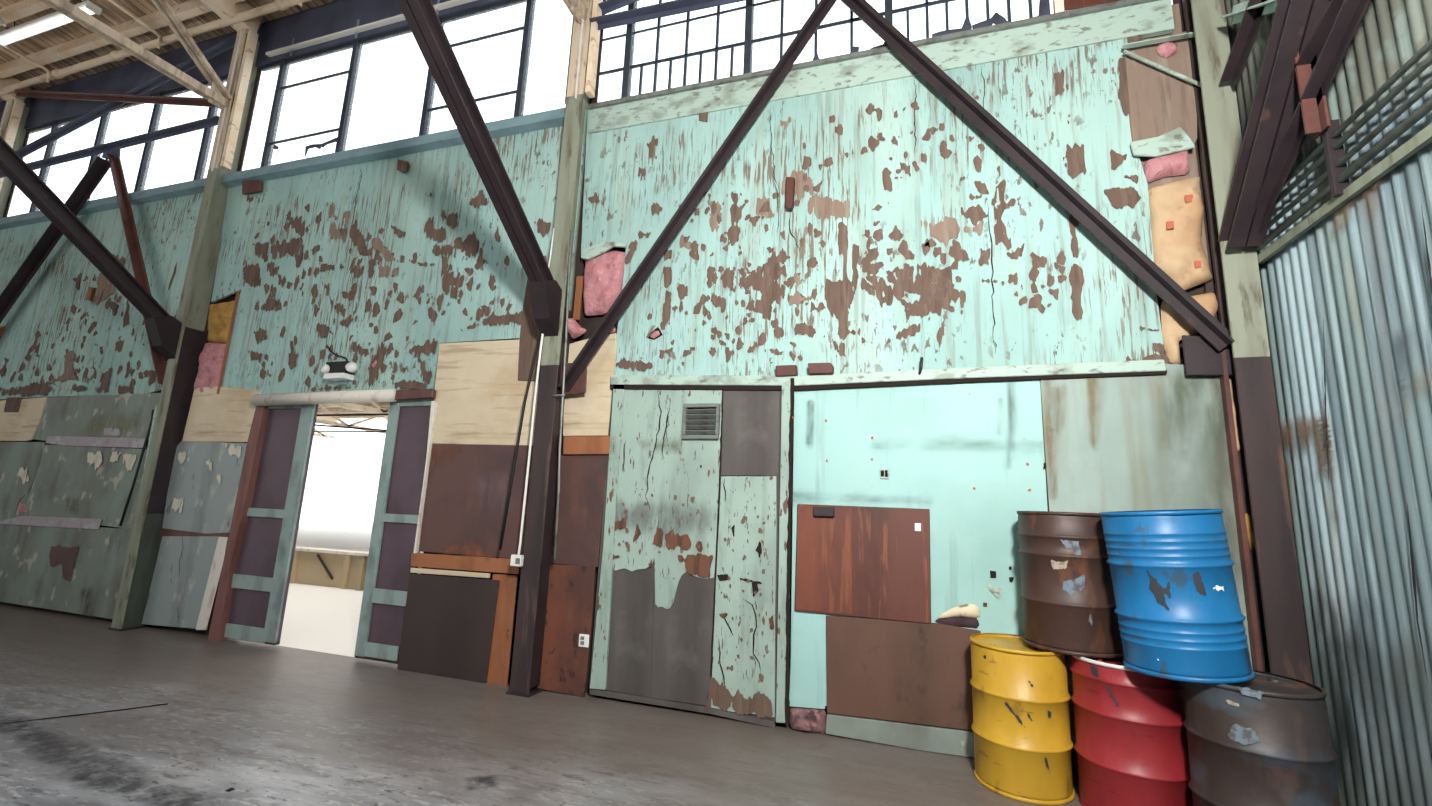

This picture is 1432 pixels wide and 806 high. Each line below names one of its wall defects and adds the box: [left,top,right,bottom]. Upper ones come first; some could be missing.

peeling [1054,69,1069,96]
peeling [1115,35,1142,116]
peeling [1104,149,1141,209]
peeling [534,218,551,237]
peeling [242,189,522,392]
peeling [0,273,156,397]
peeling [18,467,29,484]
peeling [87,427,136,471]
peeling [225,443,241,458]
peeling [49,545,79,582]
peeling [613,488,769,597]
peeling [706,613,774,719]